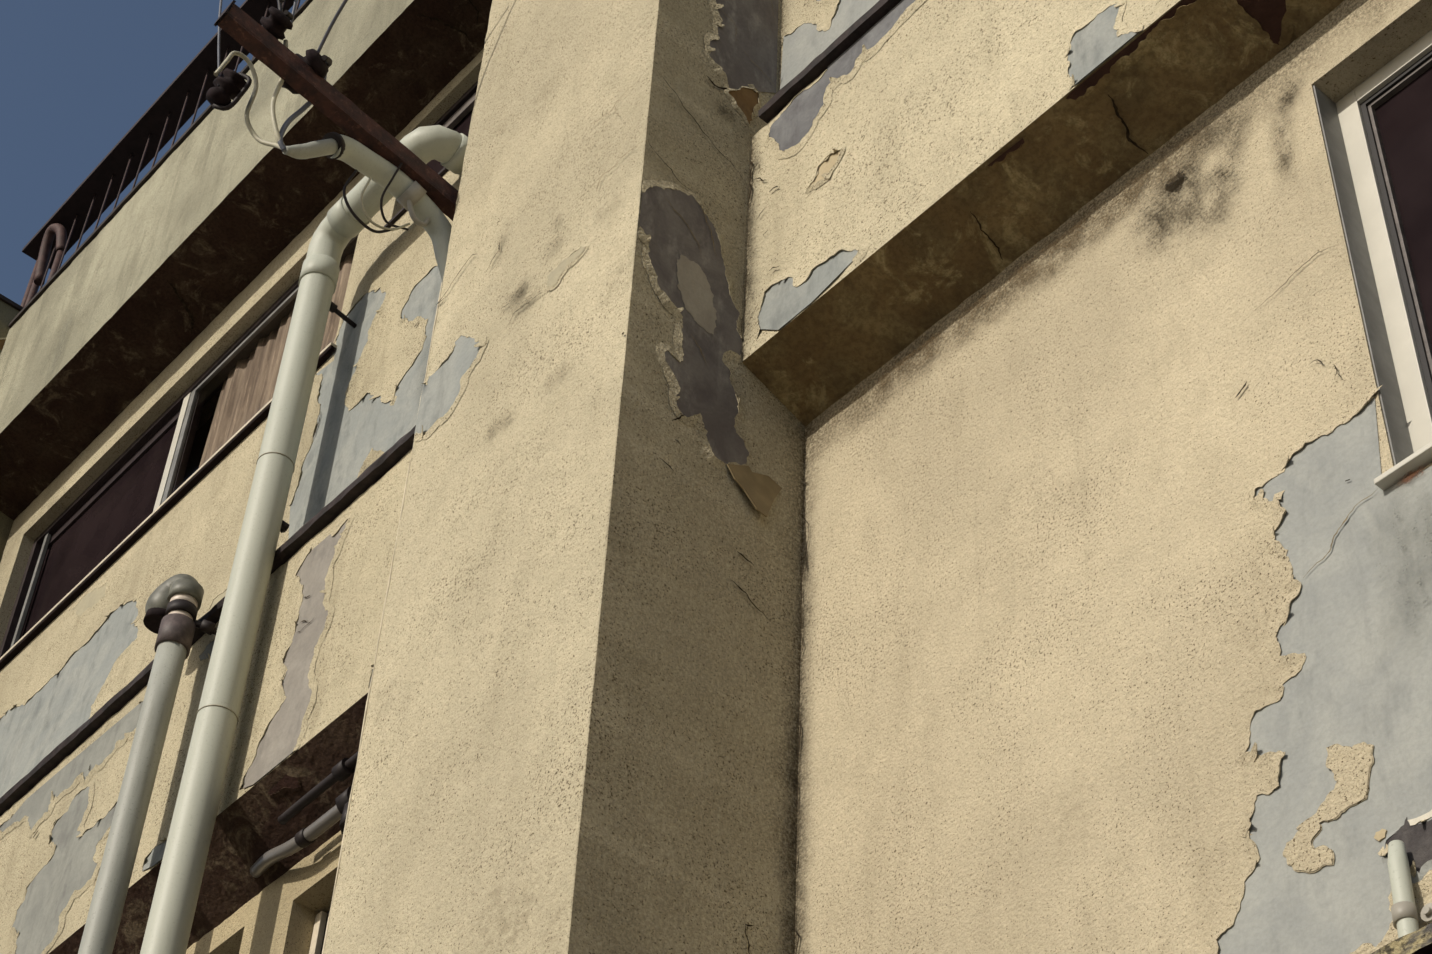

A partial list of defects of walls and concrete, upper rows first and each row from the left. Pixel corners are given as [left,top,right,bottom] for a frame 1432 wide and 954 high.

peeling [288,262,489,539]
peeling [638,179,870,517]
peeling [703,0,926,159]
crack [970,211,1003,260]
damp [830,104,1244,437]
crack [1108,95,1148,154]
damp [1273,84,1295,173]
peeling [0,578,143,798]
peeling [0,695,145,954]
peeling [239,513,355,789]
damp [783,657,809,954]
peeling [1207,385,1432,954]